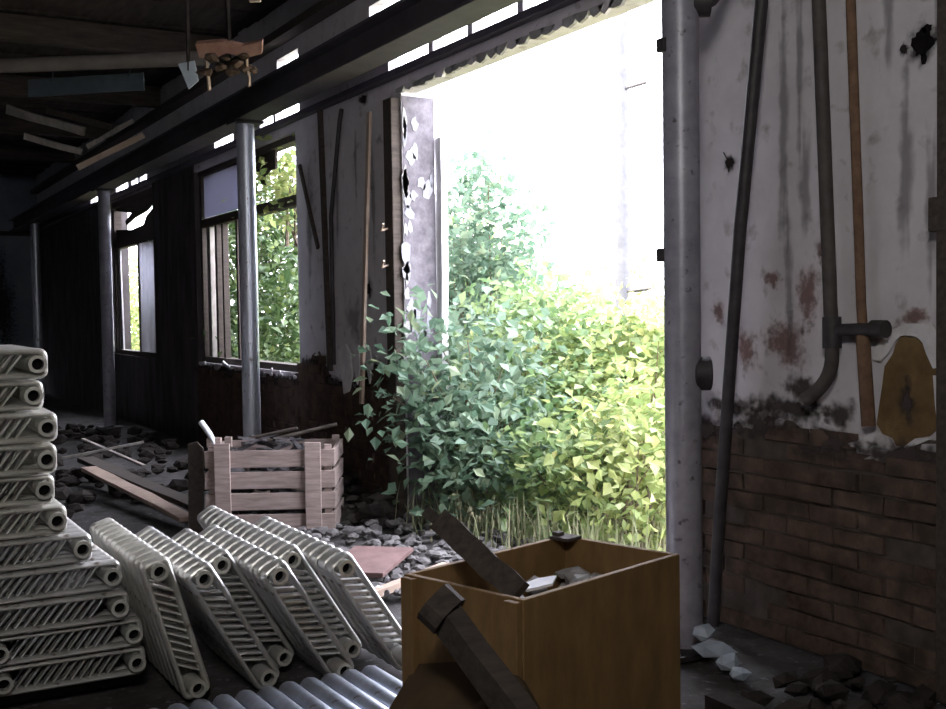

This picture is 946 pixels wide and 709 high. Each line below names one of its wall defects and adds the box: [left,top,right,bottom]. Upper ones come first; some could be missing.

peeling [401,107,433,366]
flaking render [702,409,721,617]
water stain [733,377,853,428]
flaking render [720,309,936,692]